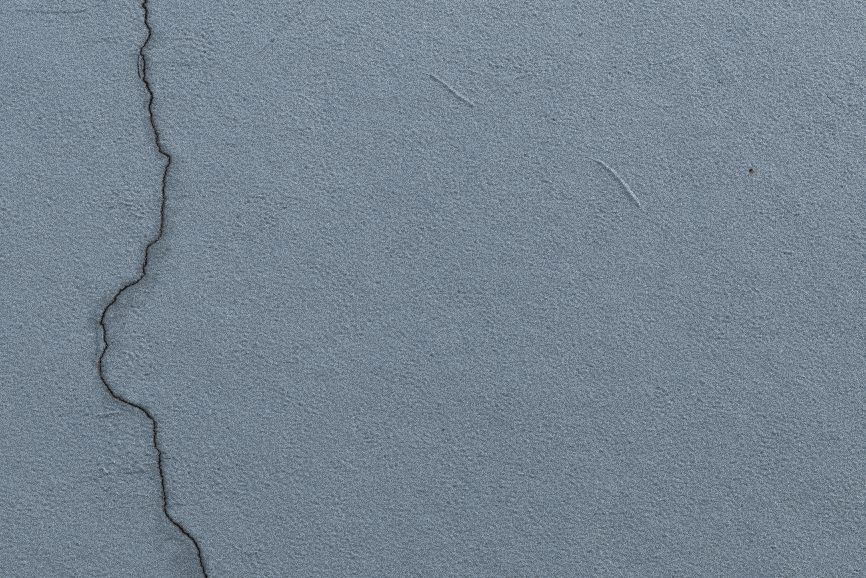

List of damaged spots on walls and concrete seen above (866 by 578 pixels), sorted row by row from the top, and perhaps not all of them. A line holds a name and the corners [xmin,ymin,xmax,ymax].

crack [72,0,208,578]